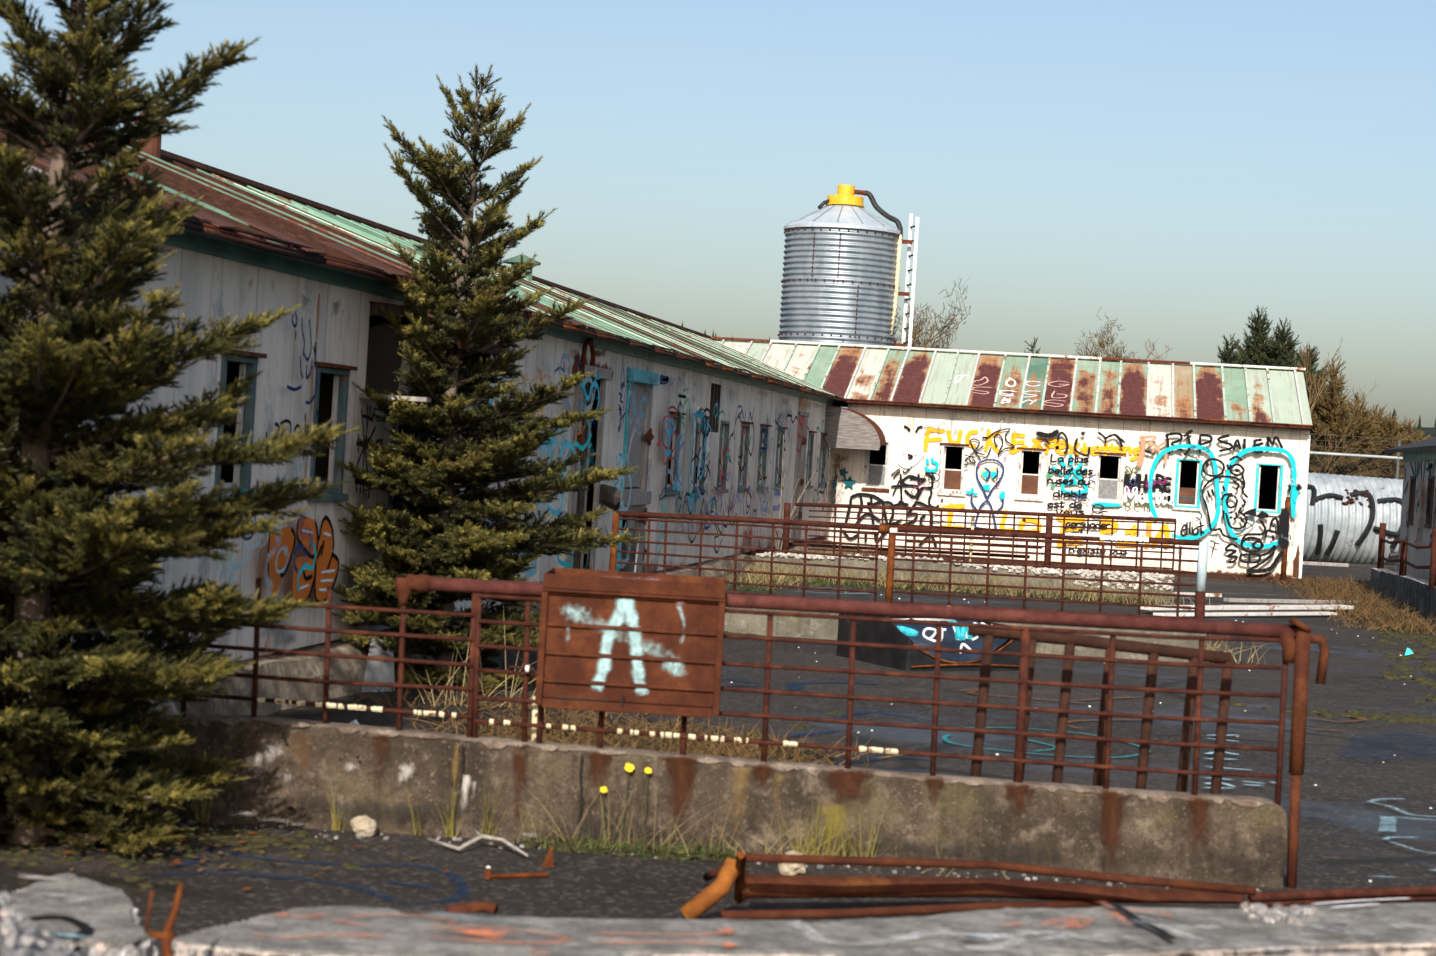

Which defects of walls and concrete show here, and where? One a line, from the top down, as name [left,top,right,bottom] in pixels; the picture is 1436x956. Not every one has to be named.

rust [590,752,611,796]
rust [663,756,695,820]
rust [752,764,773,785]
rust [824,769,874,832]
rust [1100,789,1127,861]